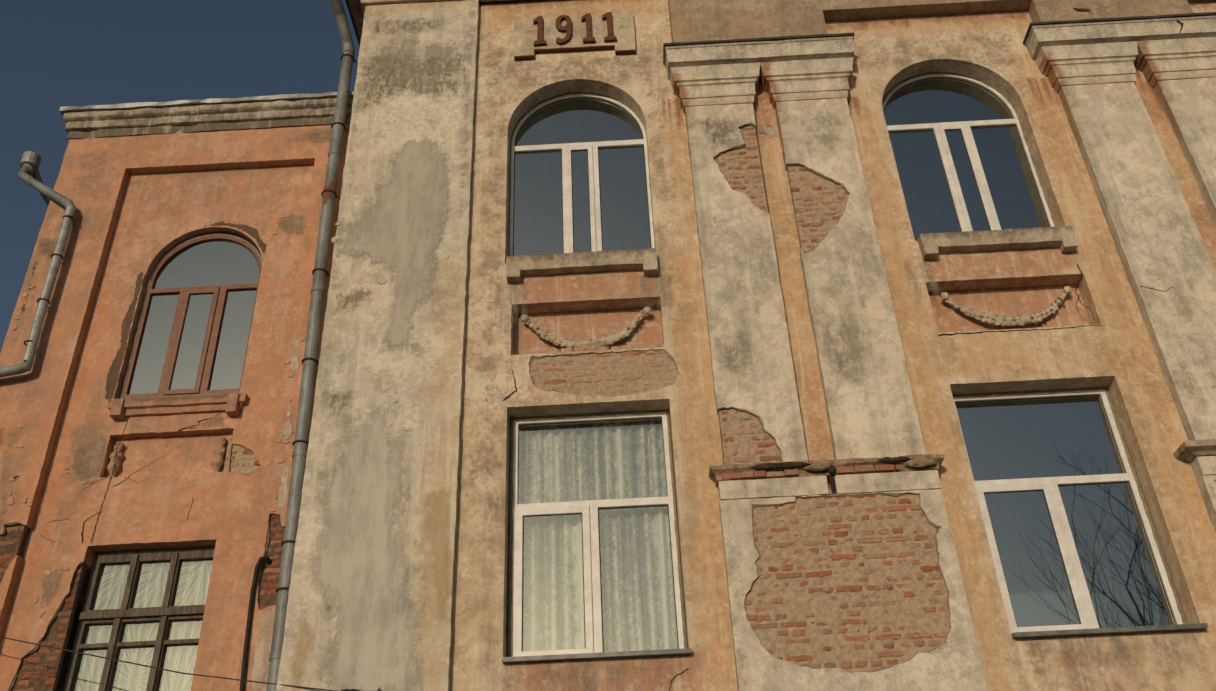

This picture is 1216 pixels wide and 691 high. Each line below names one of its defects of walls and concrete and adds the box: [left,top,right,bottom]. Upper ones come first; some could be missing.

flaking render [713,123,775,213]
flaking render [787,164,850,254]
spalling [105,272,143,399]
leakage [338,290,369,307]
flaking render [524,344,679,397]
flaking render [0,473,33,583]
flaking render [9,562,86,691]
crack [42,413,220,544]
flaking render [191,414,289,691]
flaking render [718,407,783,465]
flaking render [744,488,951,673]